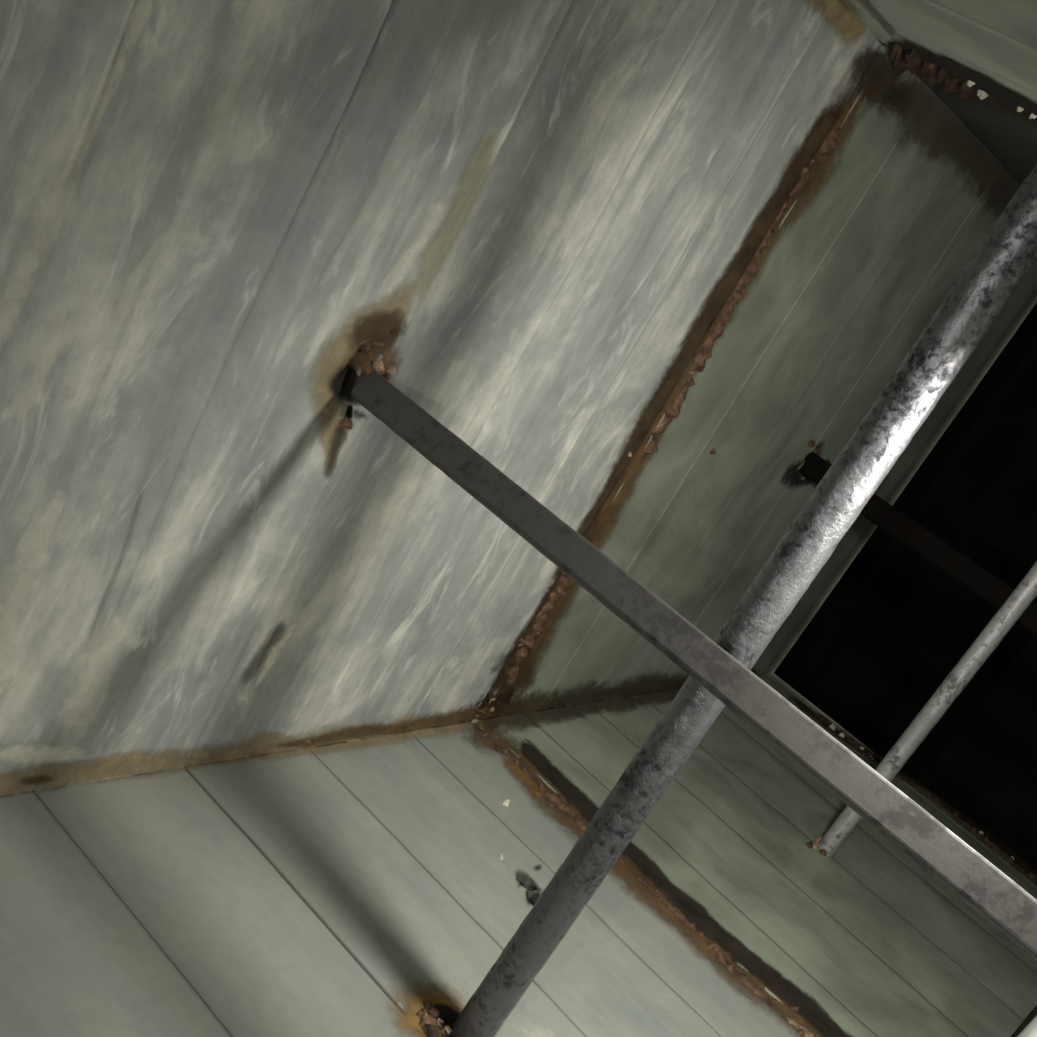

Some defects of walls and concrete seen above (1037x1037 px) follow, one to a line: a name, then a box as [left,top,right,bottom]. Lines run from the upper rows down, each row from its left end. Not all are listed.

corrosion [807,0,865,42]
corrosion [590,41,1037,549]
corrosion [0,572,687,837]
corrosion [611,854,823,1037]